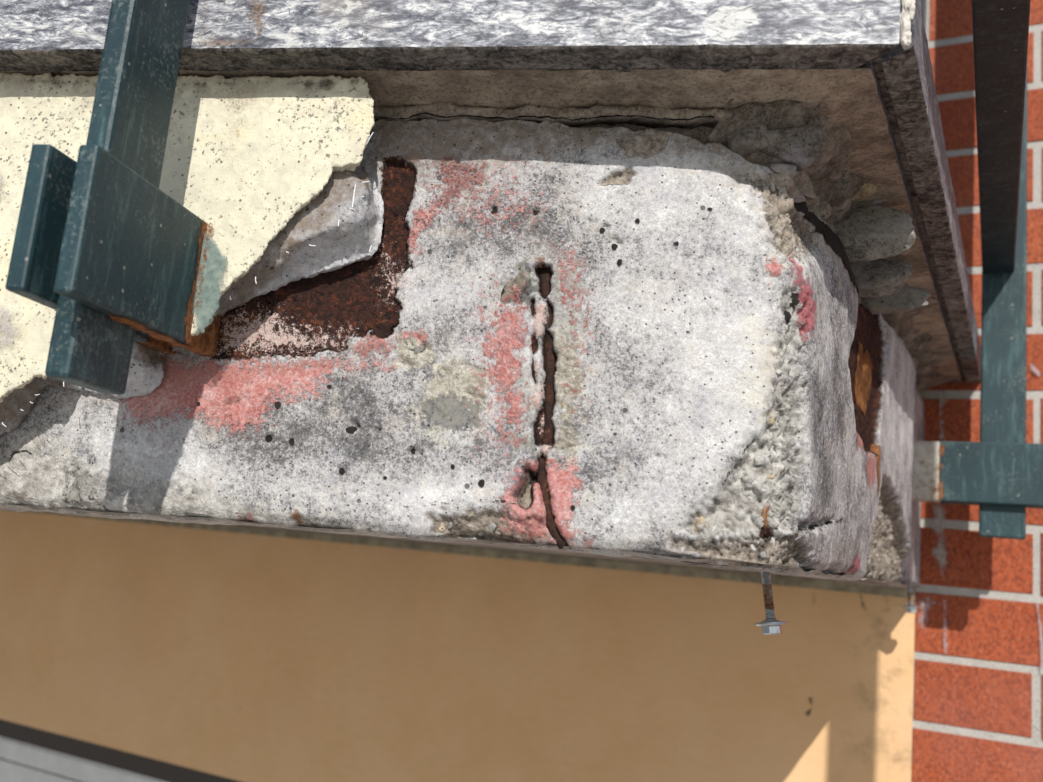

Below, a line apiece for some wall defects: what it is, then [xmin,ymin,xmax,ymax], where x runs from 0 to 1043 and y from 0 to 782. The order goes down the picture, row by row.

crack [374,112,715,121]
corrosion [211,156,418,365]
crack [794,201,859,293]
crack [501,257,568,549]
corrosion [848,303,887,494]